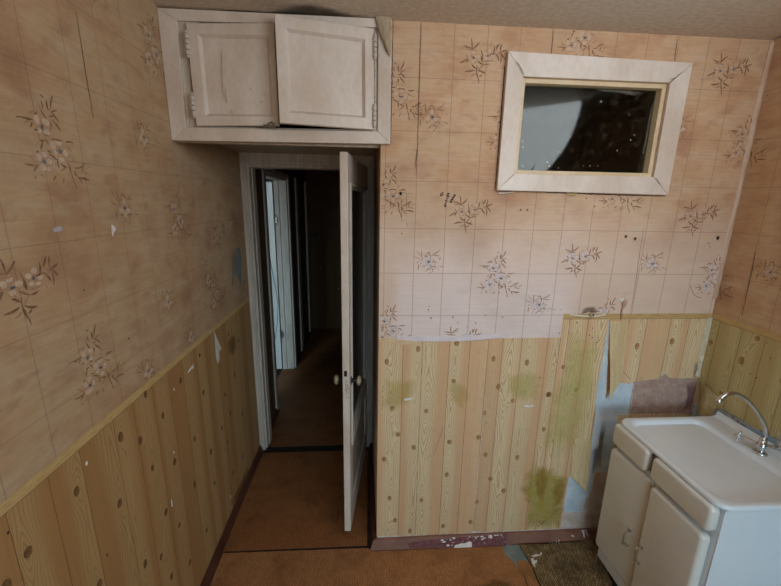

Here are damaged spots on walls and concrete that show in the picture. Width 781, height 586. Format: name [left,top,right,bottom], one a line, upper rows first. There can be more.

flaking render [377,322,634,567]
flaking render [712,408,781,446]